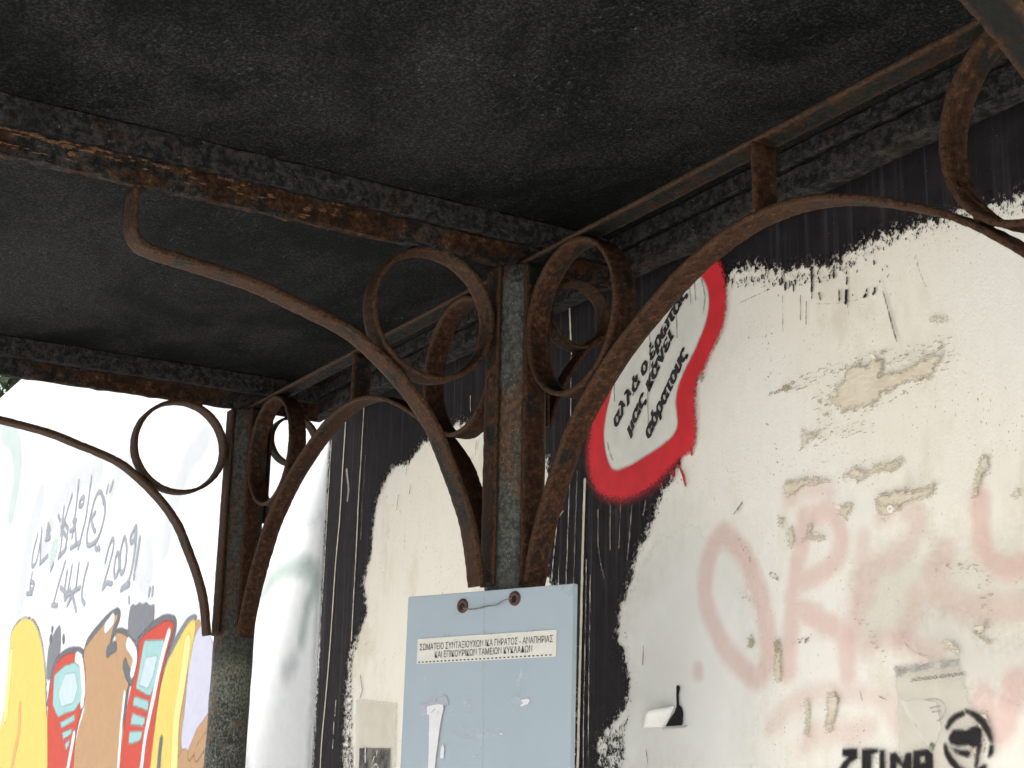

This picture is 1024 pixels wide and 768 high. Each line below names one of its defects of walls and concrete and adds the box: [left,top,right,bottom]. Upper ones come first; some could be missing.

corrosion [0,126,207,185]
peeling [769,316,958,451]
peeling [783,458,903,498]
peeling [971,455,988,499]
peeling [874,482,936,520]